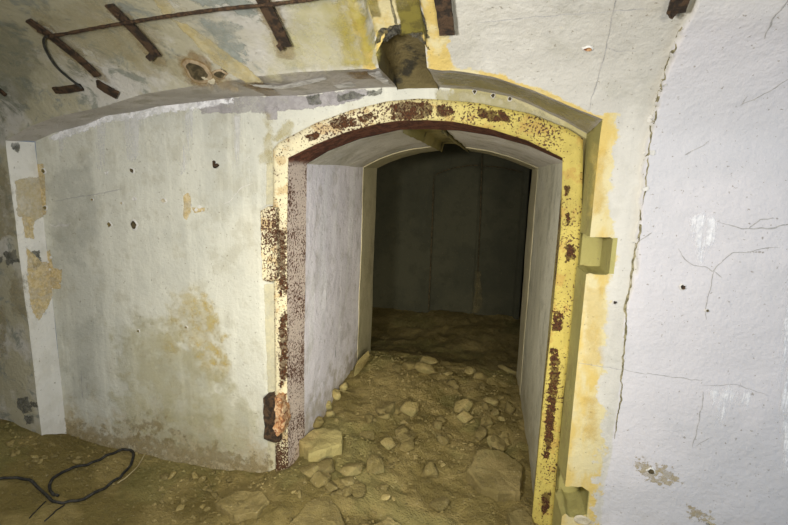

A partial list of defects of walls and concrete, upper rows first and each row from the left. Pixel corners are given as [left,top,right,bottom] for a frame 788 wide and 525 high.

rust [329,112,378,130]
rust [389,101,455,121]
rust [478,108,511,123]
rust [278,229,289,297]
rust [565,244,576,263]
rust [551,310,564,332]
rust [278,310,290,388]
rust [542,348,561,460]
rust [541,490,551,517]